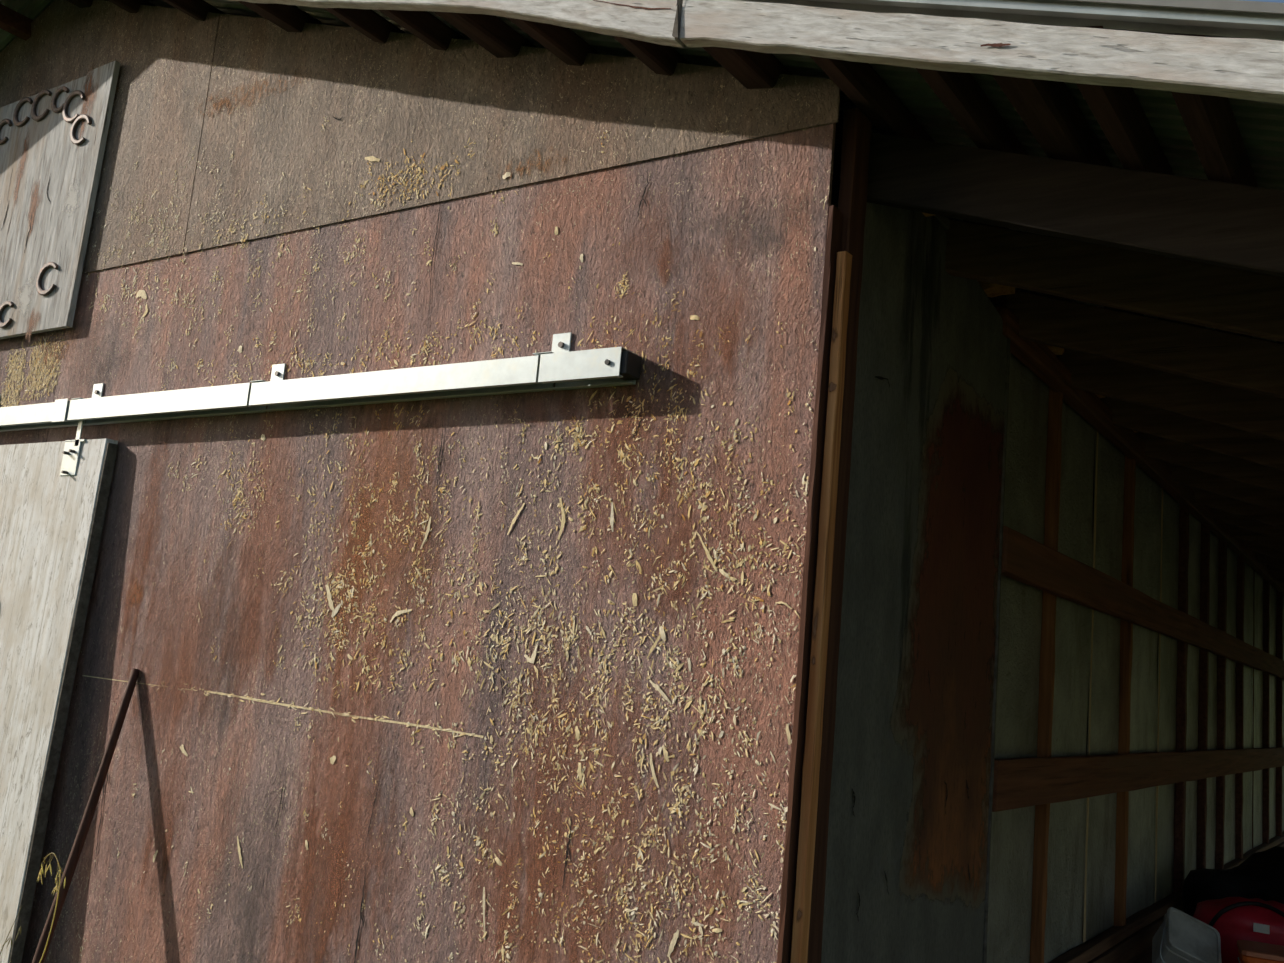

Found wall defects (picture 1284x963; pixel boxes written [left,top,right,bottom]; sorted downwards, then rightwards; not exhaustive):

corrosion [336,513,370,664]
corrosion [497,791,556,957]
corrosion [571,864,601,963]